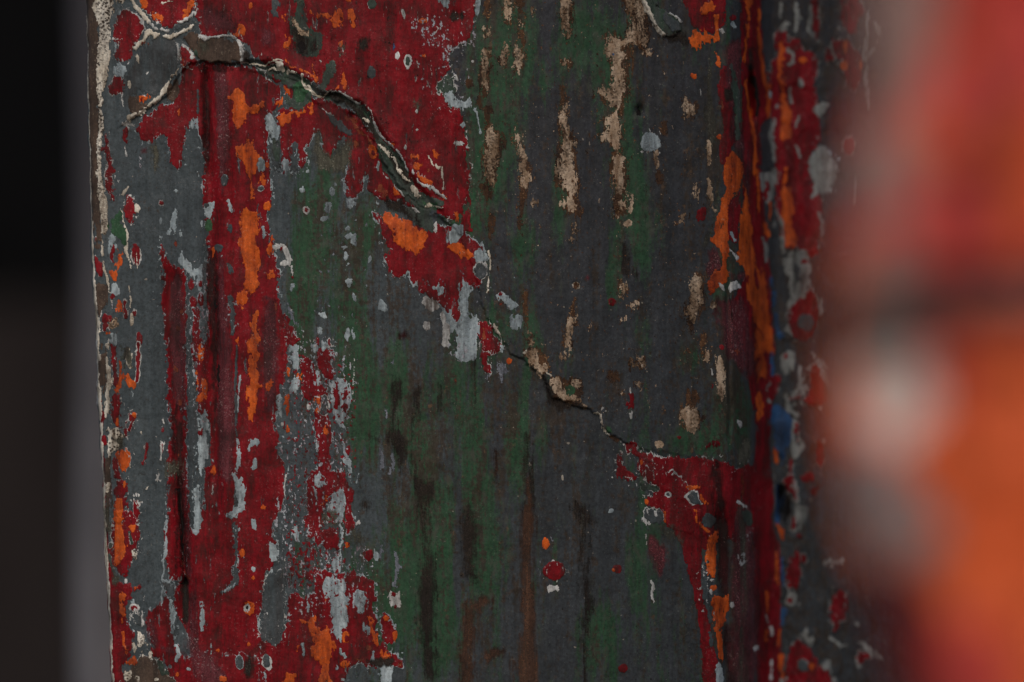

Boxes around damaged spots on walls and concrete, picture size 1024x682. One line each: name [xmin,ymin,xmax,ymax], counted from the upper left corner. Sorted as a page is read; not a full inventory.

crack [248,59,447,233]
peeling [86,0,612,682]
peeling [611,0,1024,682]